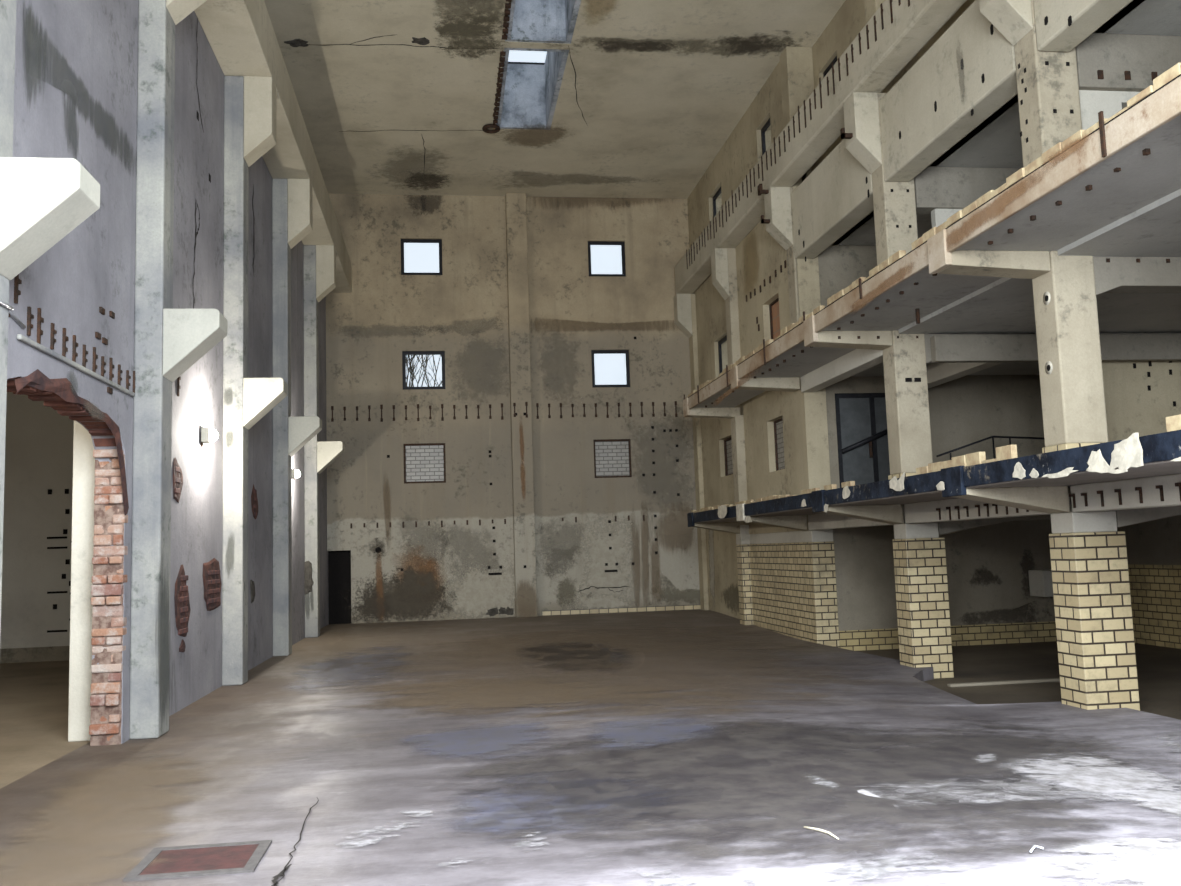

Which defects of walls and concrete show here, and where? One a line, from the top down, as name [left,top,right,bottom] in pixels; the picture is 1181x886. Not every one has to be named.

damp [436,0,504,58]
damp [583,31,790,55]
damp [24,14,132,165]
peeling [889,472,905,491]
peeling [1013,433,1144,479]
rust [372,538,384,618]
crack [271,798,319,886]